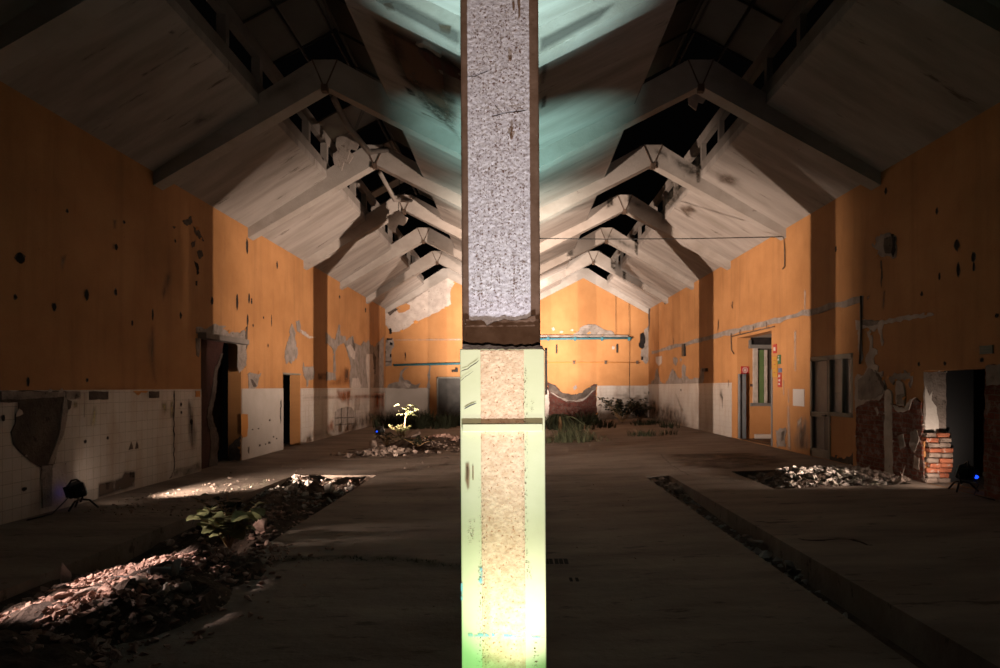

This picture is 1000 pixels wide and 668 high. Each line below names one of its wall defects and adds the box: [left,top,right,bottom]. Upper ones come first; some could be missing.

flaking render [379,0,615,420]
peeling [0,377,109,469]
flaking render [196,294,272,389]
flaking render [285,278,456,390]
flaking render [830,312,947,483]